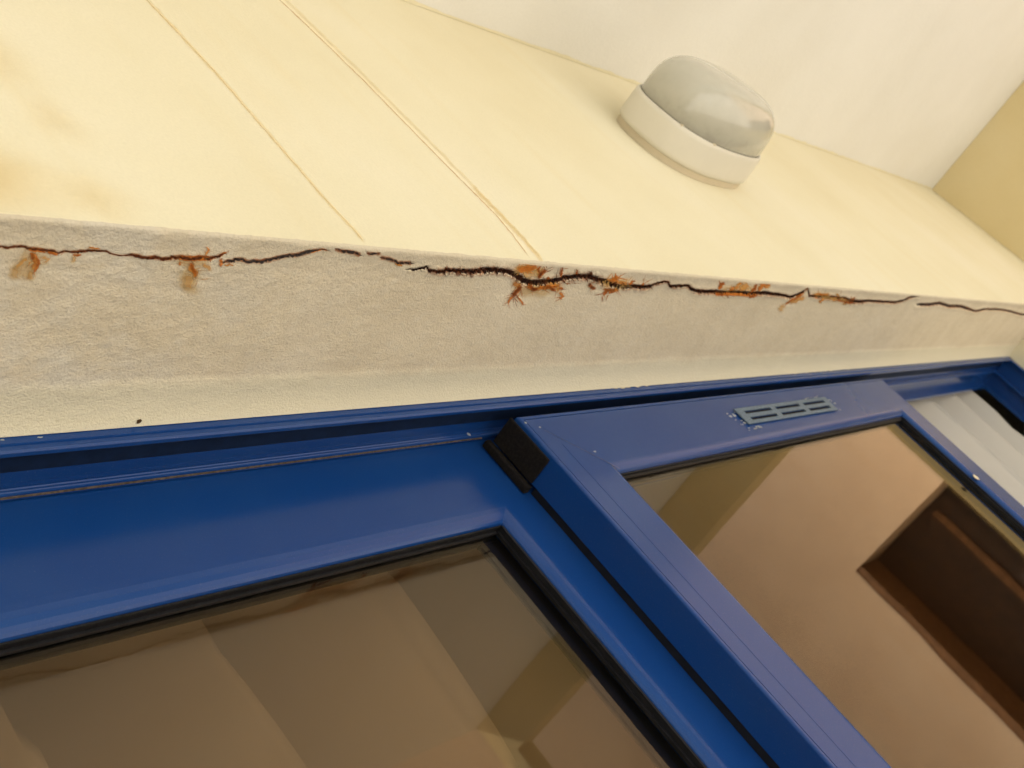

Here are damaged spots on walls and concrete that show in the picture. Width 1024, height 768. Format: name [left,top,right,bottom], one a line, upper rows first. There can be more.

rust [16,247,100,278]
rust [178,246,233,284]
crack [0,245,1024,315]
rust [504,264,652,308]
rust [715,280,770,298]